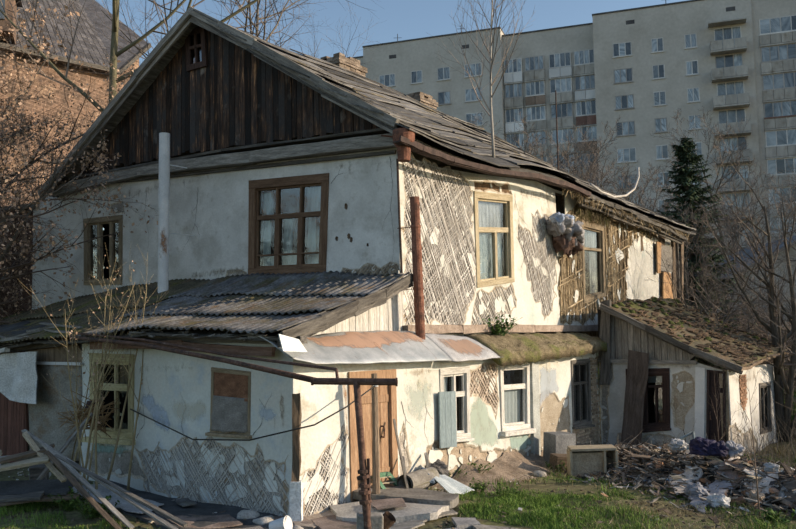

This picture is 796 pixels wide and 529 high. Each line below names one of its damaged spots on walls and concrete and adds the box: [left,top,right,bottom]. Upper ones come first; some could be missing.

spalling [341,153,517,325]
spalling [518,204,658,325]
corrosion [307,331,423,350]
corrosion [443,339,483,355]
spalling [426,356,632,478]
spalling [642,371,695,449]
spalling [88,436,290,516]
spalling [299,423,349,516]